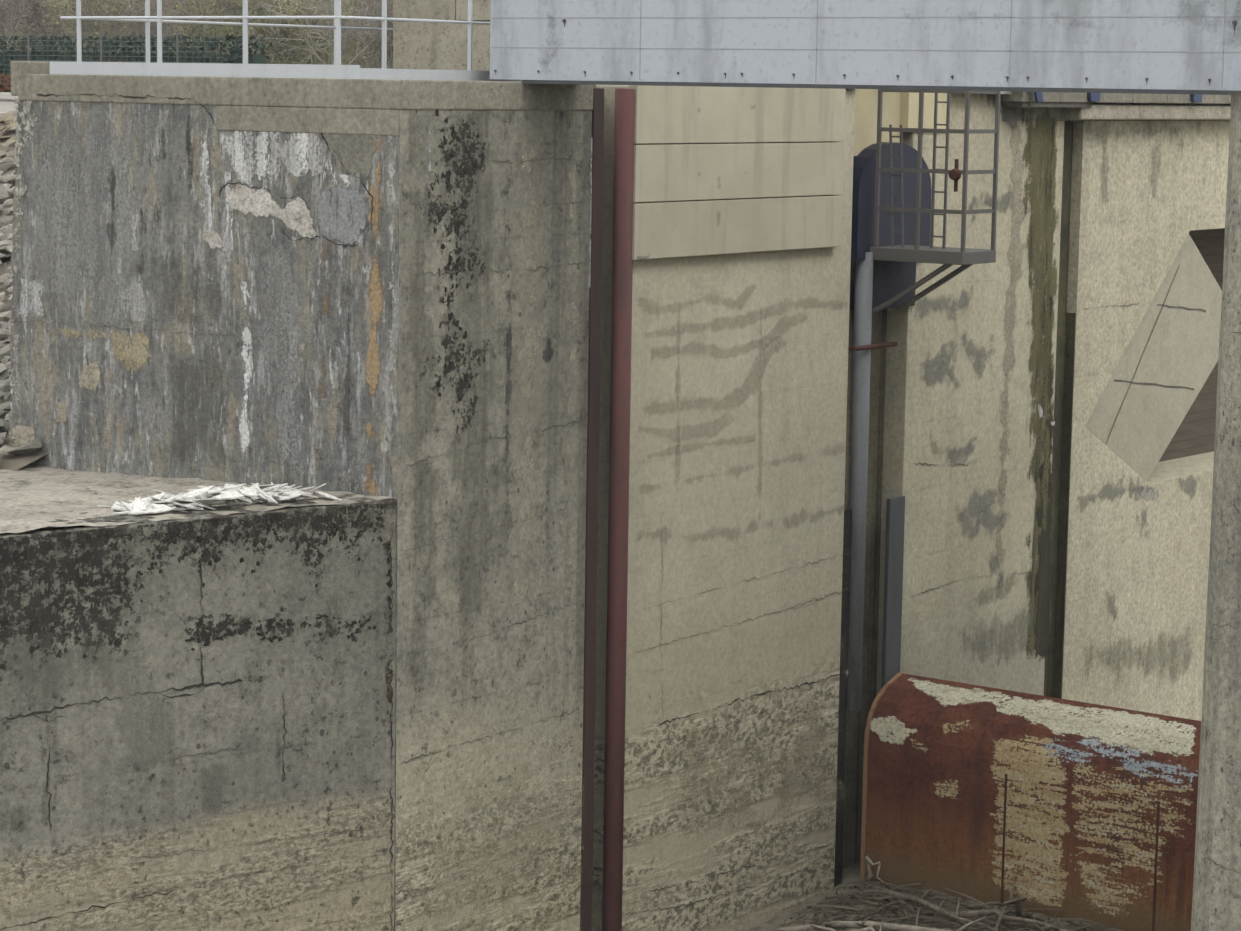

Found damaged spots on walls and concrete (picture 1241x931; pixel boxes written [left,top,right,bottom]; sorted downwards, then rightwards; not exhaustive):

peeling [202,228,222,249]
peeling [224,183,370,245]
leakage [1034,297,1054,659]
crack [0,504,584,931]